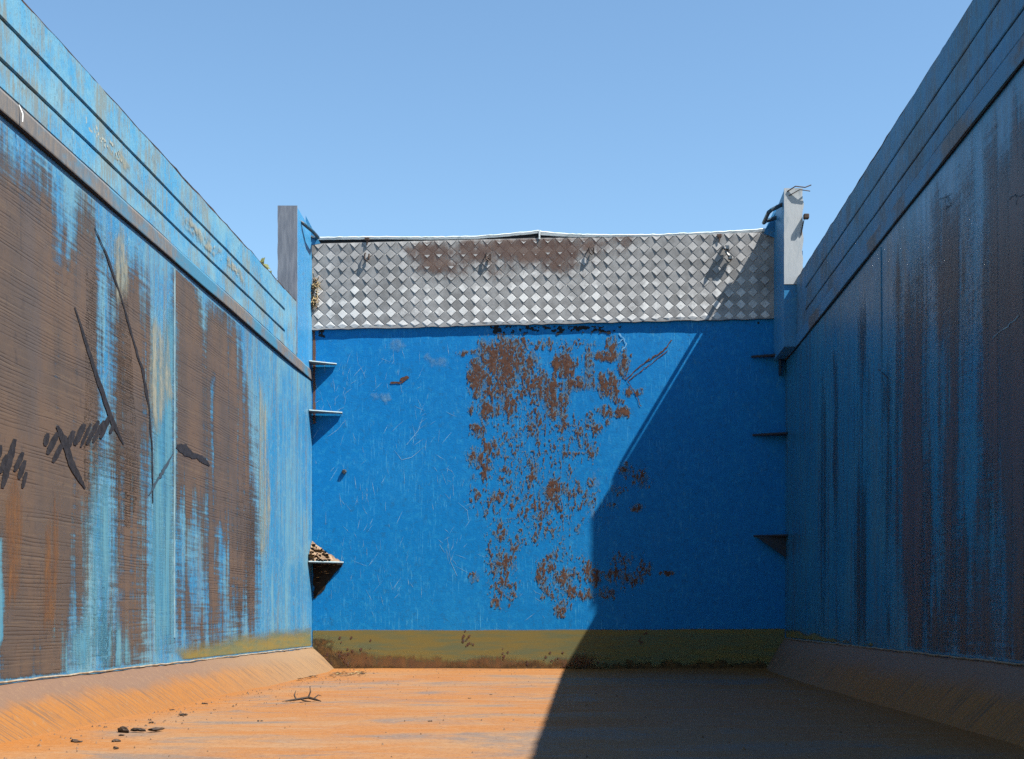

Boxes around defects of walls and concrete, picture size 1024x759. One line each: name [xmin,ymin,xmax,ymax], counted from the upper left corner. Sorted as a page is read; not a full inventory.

peeling [86,118,129,169]
peeling [186,218,244,282]
rust [407,238,598,273]
leakage [179,629,849,669]